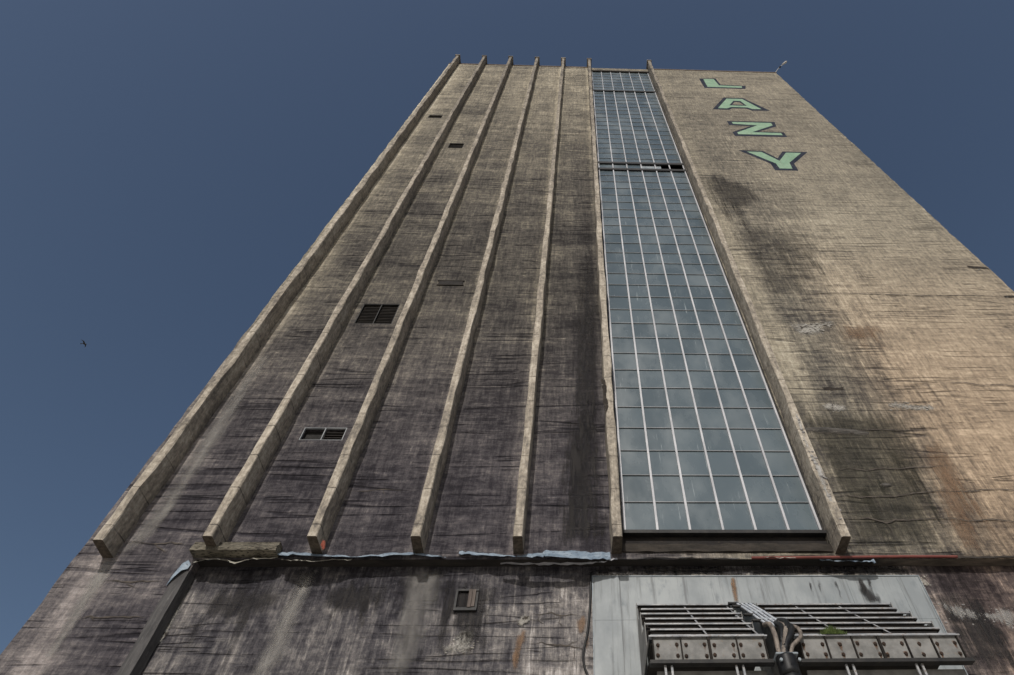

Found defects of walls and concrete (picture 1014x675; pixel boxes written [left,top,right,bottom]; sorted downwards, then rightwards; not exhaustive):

leakage [939,594,1014,668]